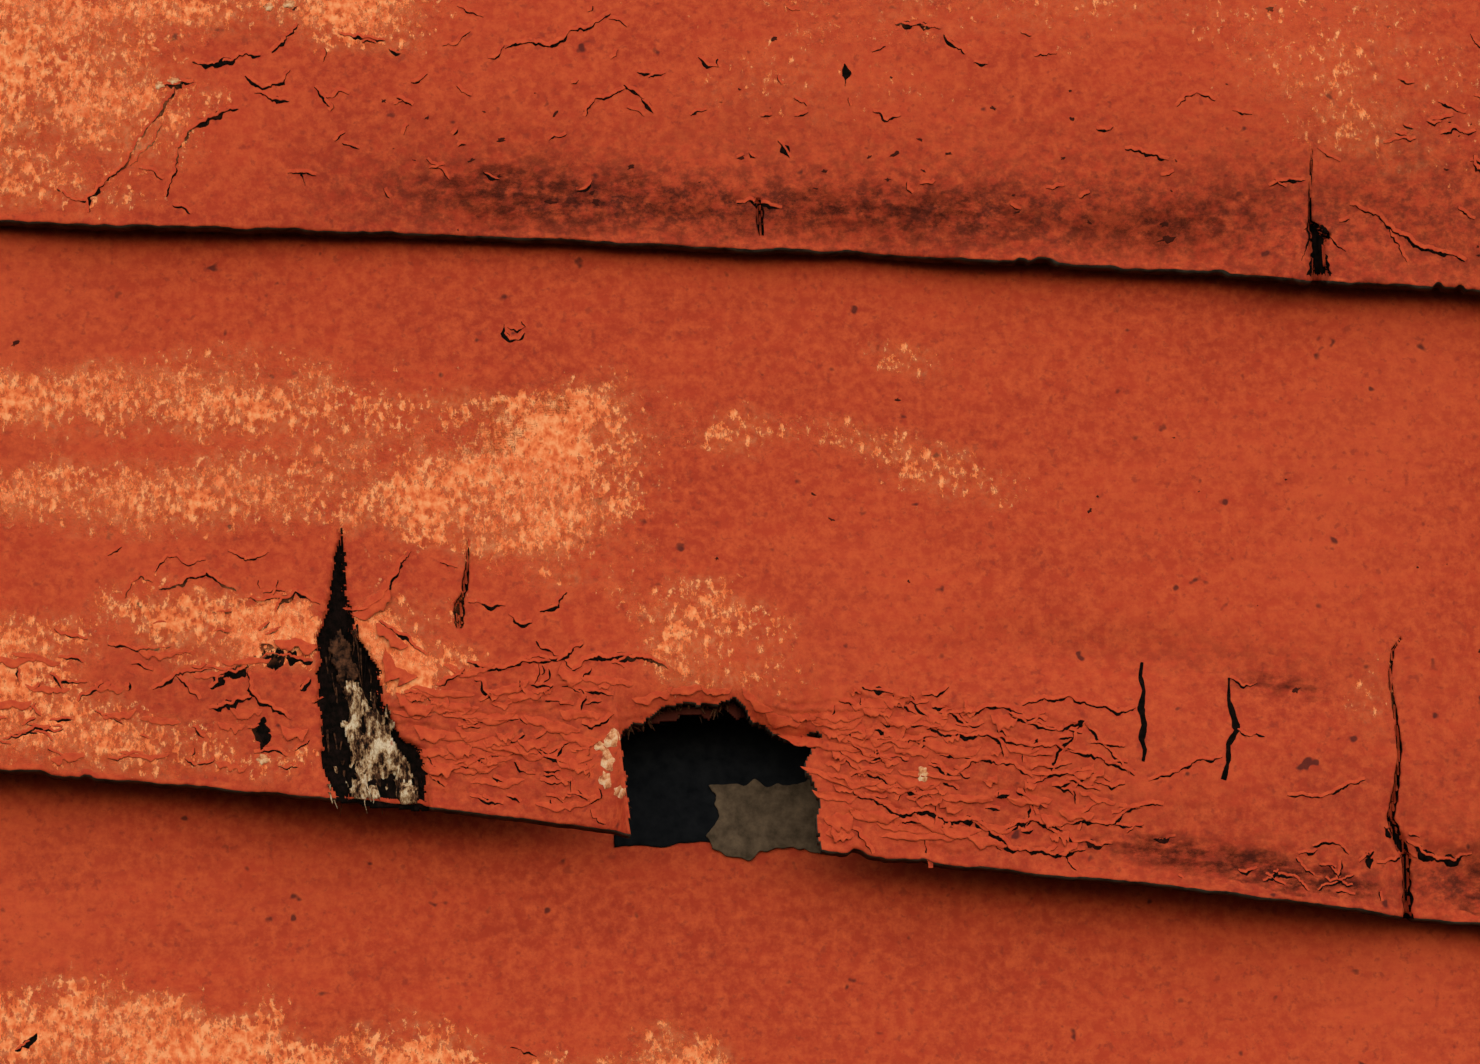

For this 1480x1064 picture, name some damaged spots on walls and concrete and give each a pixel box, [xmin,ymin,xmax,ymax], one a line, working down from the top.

spalling [263,0,298,11]
spalling [155,77,181,89]
crack [1383,75,1480,172]
spalling [1154,222,1176,244]
crack [1268,145,1467,278]
crack [1458,206,1476,220]
peeling [0,652,61,669]
peeling [0,684,70,711]
crack [0,542,670,825]
spalling [192,528,1116,856]
crack [826,662,1265,879]
crack [1238,638,1472,919]